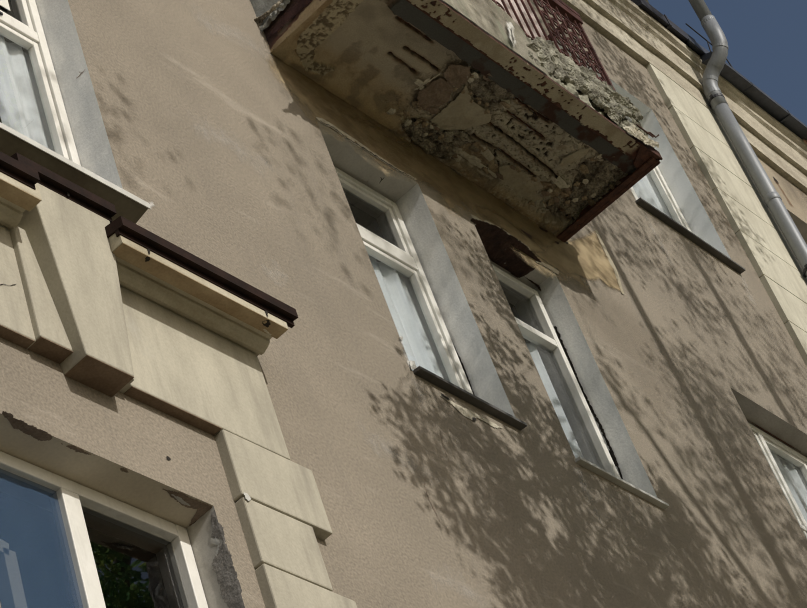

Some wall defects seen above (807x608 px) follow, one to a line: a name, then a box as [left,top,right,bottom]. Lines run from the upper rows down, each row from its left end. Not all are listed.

spalling [254,0,284,28]
spalling [386,72,549,180]
spalling [526,36,659,148]
spalling [534,154,624,225]
flaking render [470,214,624,294]
peeling [2,411,52,441]
flaking render [440,393,501,428]
peeling [163,489,245,608]